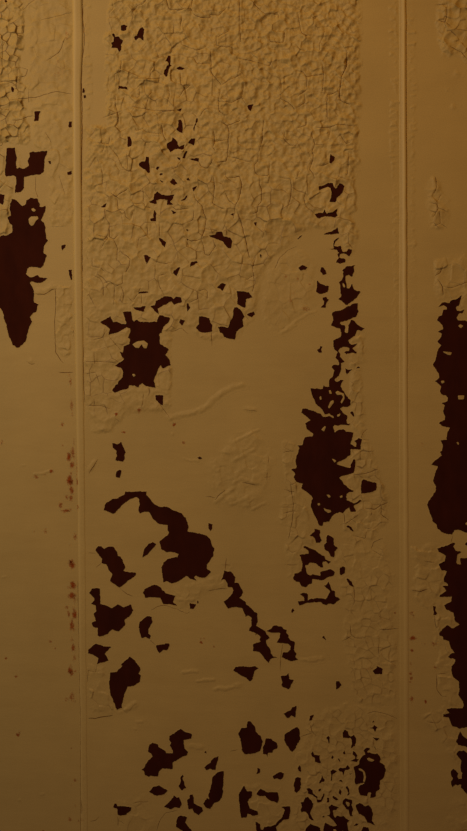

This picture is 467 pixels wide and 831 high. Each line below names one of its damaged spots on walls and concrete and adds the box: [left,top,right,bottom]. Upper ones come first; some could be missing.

crack [1,4,167,304]
crack [137,0,350,291]
peeling [0,0,399,711]
peeling [417,255,467,831]
peeling [112,727,226,831]
peeling [236,704,387,831]